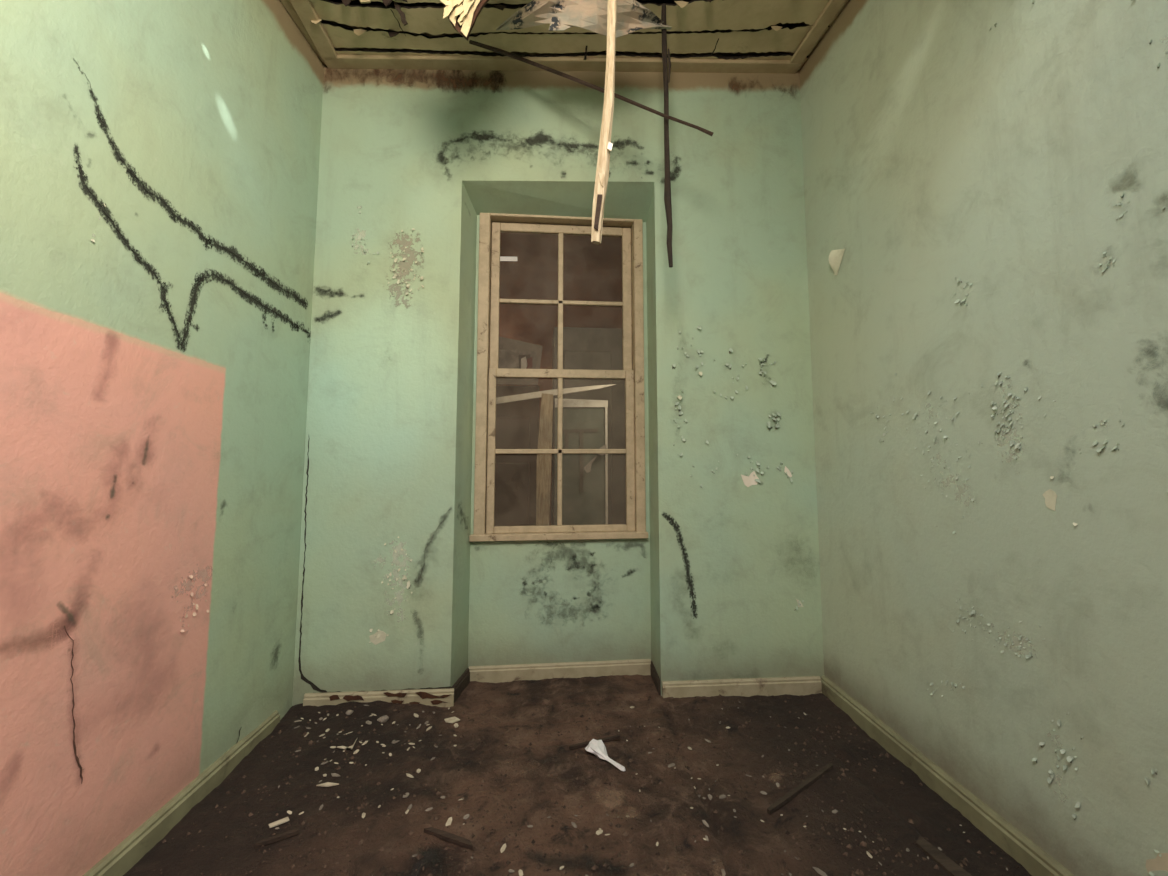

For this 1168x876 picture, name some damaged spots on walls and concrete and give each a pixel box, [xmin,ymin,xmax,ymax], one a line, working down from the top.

crack [73,58,311,352]
water stain [439,131,598,176]
water stain [612,140,639,149]
water stain [630,158,681,182]
peeling [352,228,424,308]
crack [298,434,454,693]
crack [662,513,697,619]
crack [64,610,83,784]